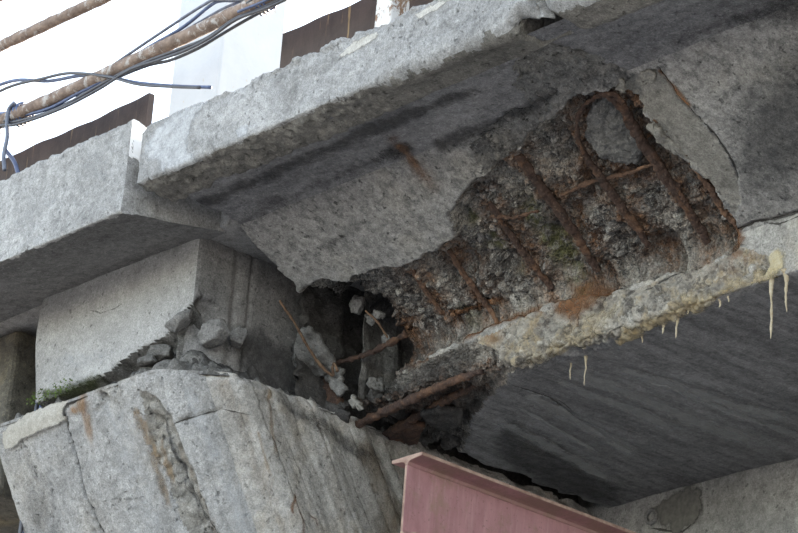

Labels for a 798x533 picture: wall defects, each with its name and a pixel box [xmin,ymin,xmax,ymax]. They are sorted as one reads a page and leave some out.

leakage [199,90,479,206]
crack [692,110,738,173]
crack [739,196,798,230]
spalling [292,43,780,455]
leakage [748,250,783,284]
corrosion [465,308,540,339]
corrosion [555,285,613,319]
leakage [617,283,741,346]
spalling [2,295,295,449]
crack [174,409,255,425]
corrosion [135,411,174,496]